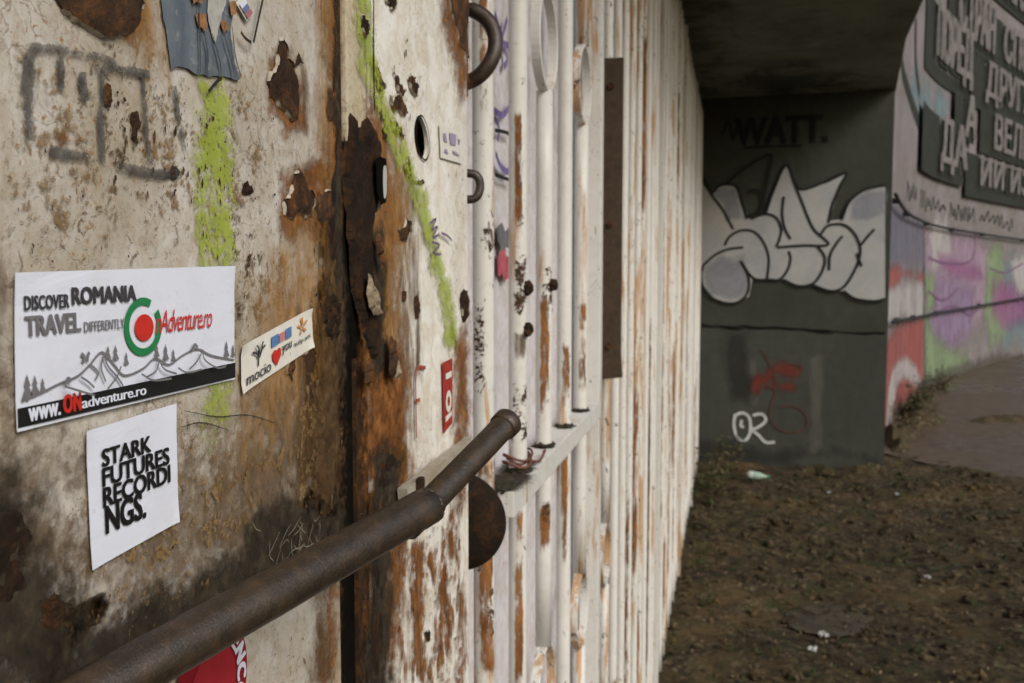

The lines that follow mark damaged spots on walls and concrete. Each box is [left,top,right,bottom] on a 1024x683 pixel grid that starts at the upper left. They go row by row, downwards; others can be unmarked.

corrosion [540,267,553,411]
corrosion [479,557,495,672]